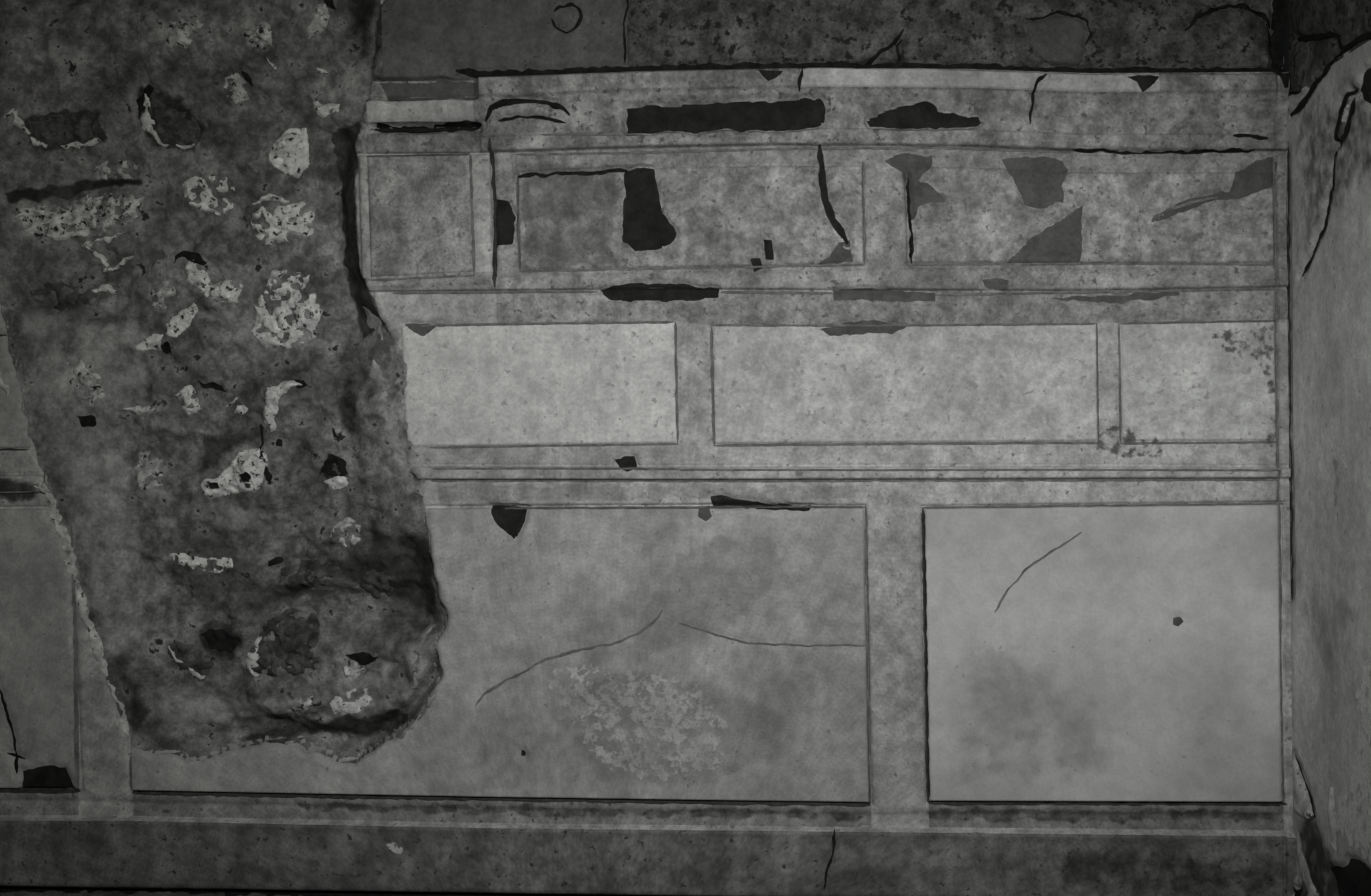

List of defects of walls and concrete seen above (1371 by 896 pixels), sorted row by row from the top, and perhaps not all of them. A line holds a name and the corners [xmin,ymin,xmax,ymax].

spalling [626,98,826,134]
spalling [867,101,981,130]
spalling [622,168,677,251]
spalling [983,156,1083,290]
crack [374,0,1371,599]
spalling [0,0,478,764]
crack [995,532,1081,612]
crack [475,609,866,706]
crack [0,689,25,773]
spalling [22,765,74,788]
damp [548,664,728,782]
spalling [1293,758,1371,896]